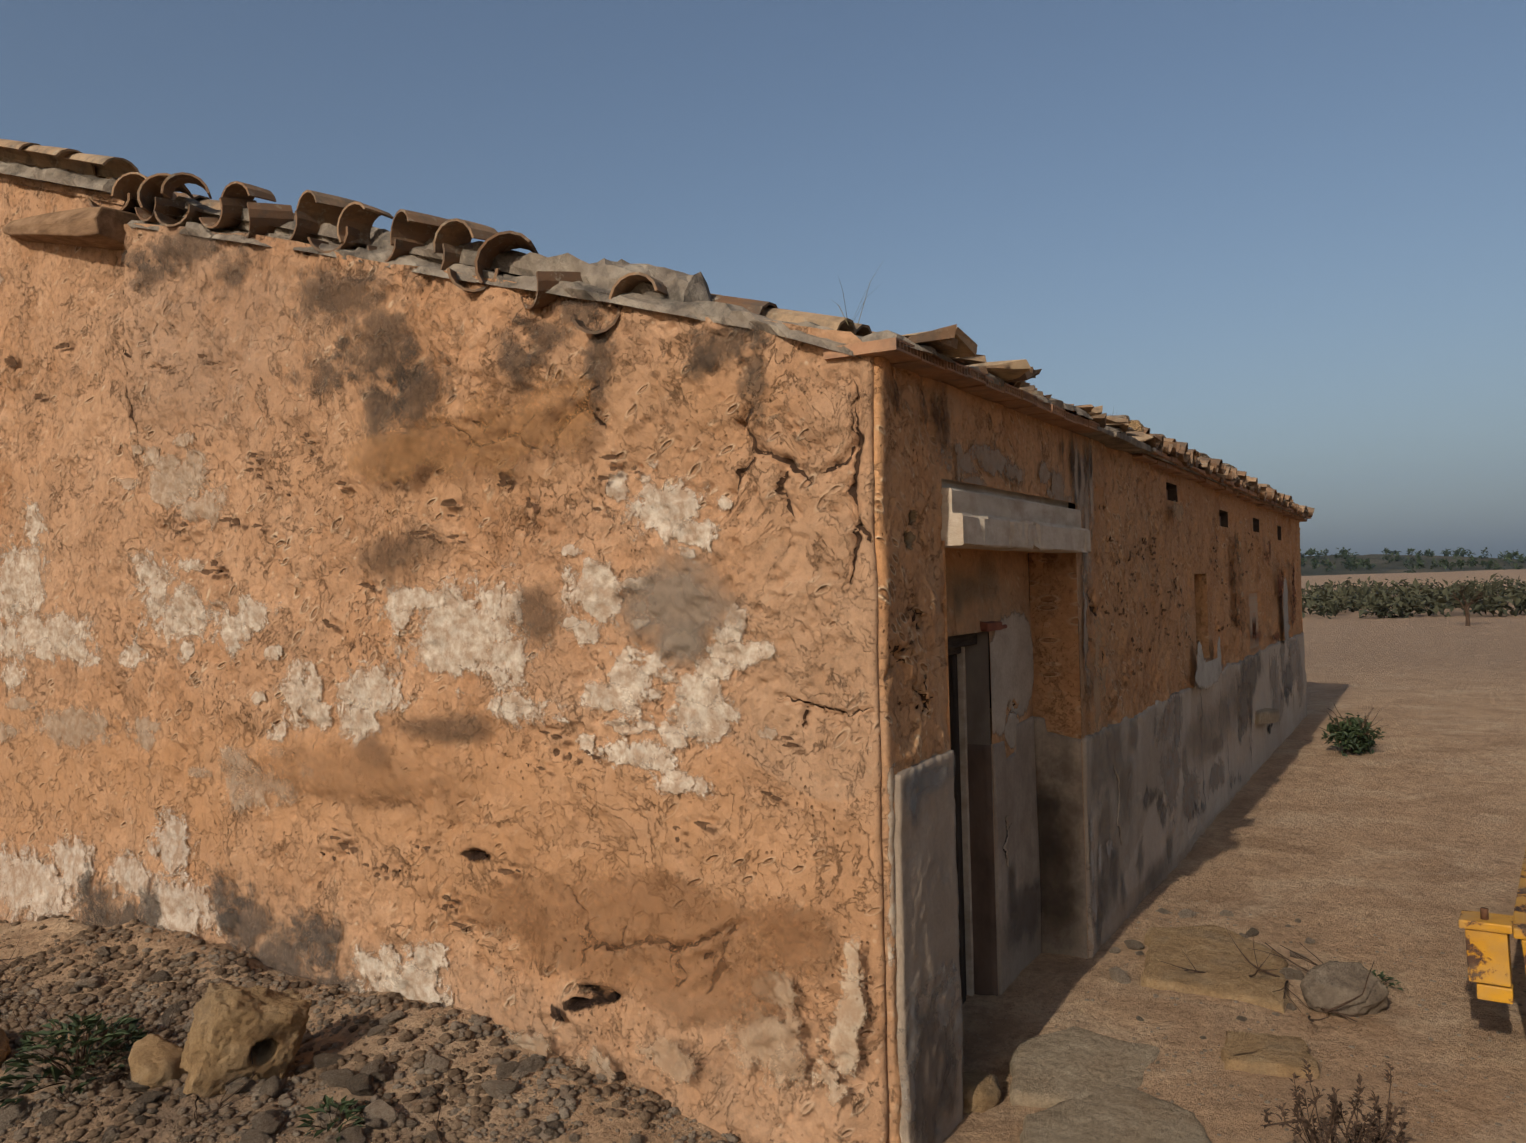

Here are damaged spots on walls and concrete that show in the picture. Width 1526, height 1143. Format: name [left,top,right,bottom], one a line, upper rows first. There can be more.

crack [736,379,871,583]
damp [1061,440,1093,530]
peeling [0,497,779,815]
crack [776,596,933,728]
peeling [758,726,799,747]
spalling [673,821,710,842]